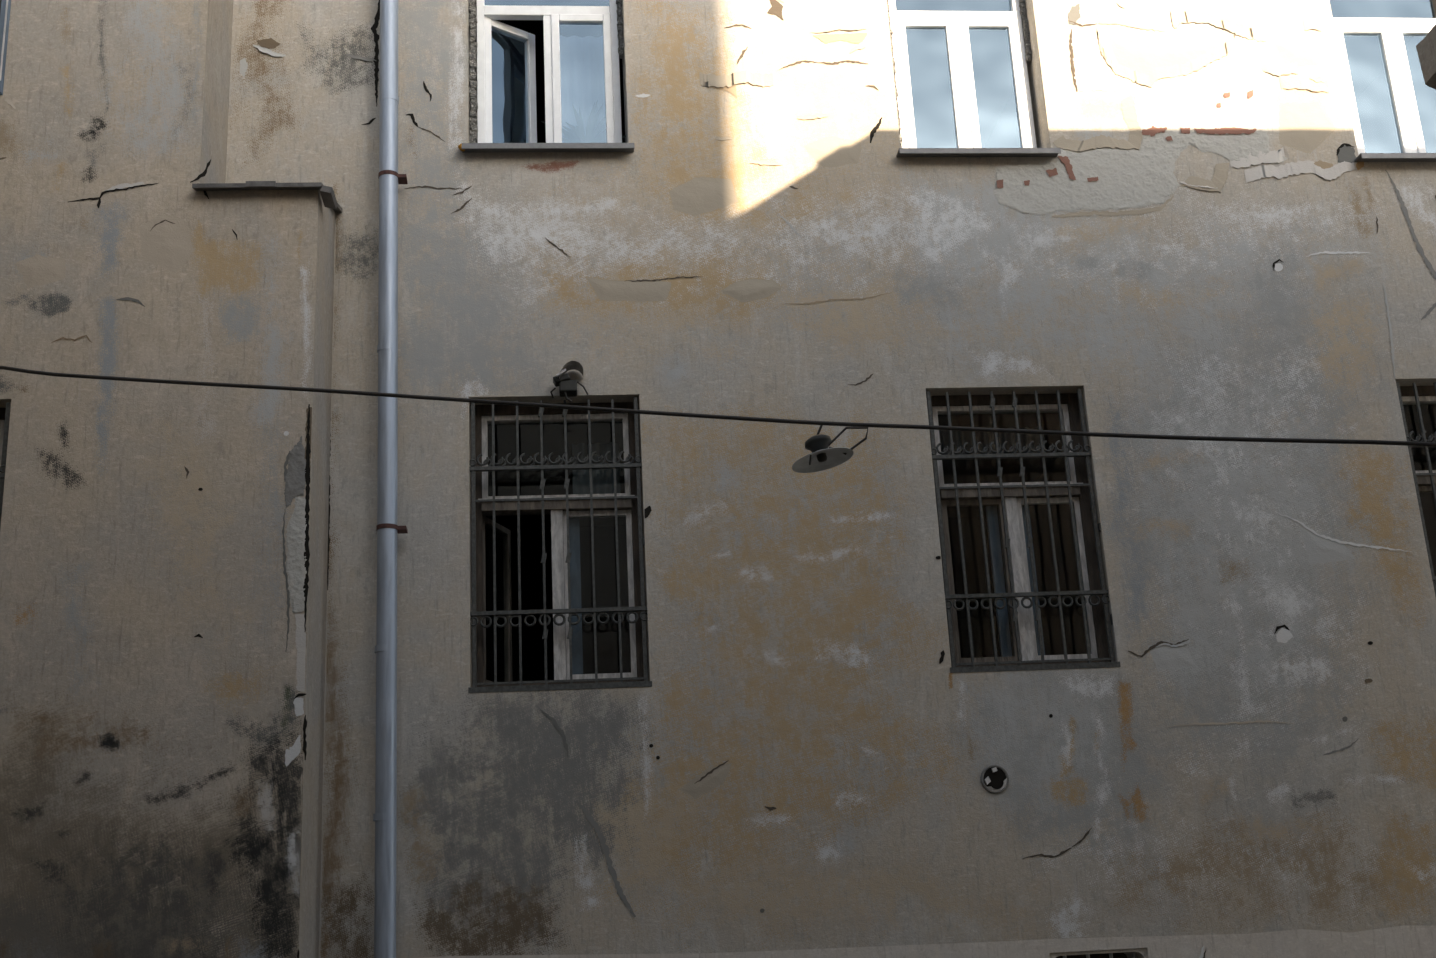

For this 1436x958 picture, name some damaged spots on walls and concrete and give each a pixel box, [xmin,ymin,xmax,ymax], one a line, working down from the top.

crack [69,160,211,208]
damp [230,0,380,179]
crack [362,0,445,142]
flaking render [767,0,784,20]
flaking render [993,4,1364,218]
damp [0,193,315,958]
flaking render [285,735,301,767]
flaking render [284,407,312,716]
damp [320,407,375,958]
damp [397,0,1436,957]
crack [1128,639,1189,657]
crack [1023,829,1091,859]